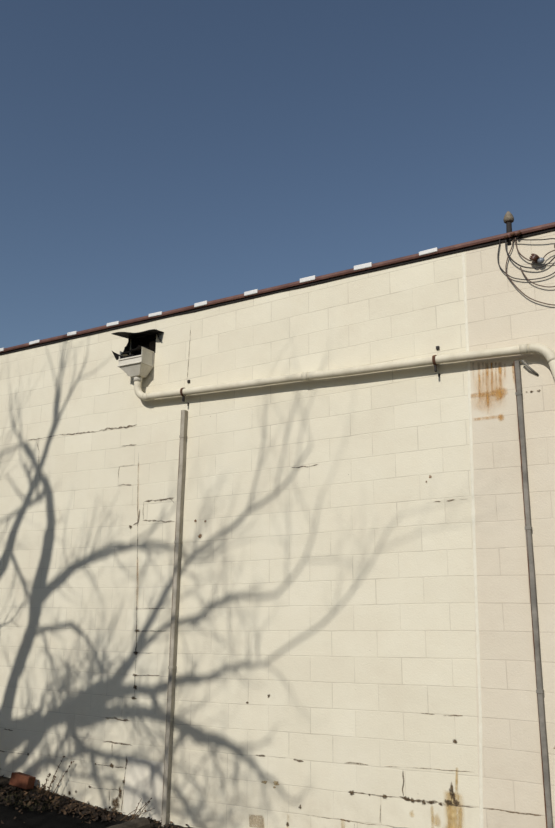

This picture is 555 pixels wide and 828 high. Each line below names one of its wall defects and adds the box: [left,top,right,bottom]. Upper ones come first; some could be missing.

rust [479,363,504,403]
crack [31,425,139,476]
rust [512,364,526,520]
crack [118,467,173,566]
rust [525,530,547,828]
crack [308,766,541,825]